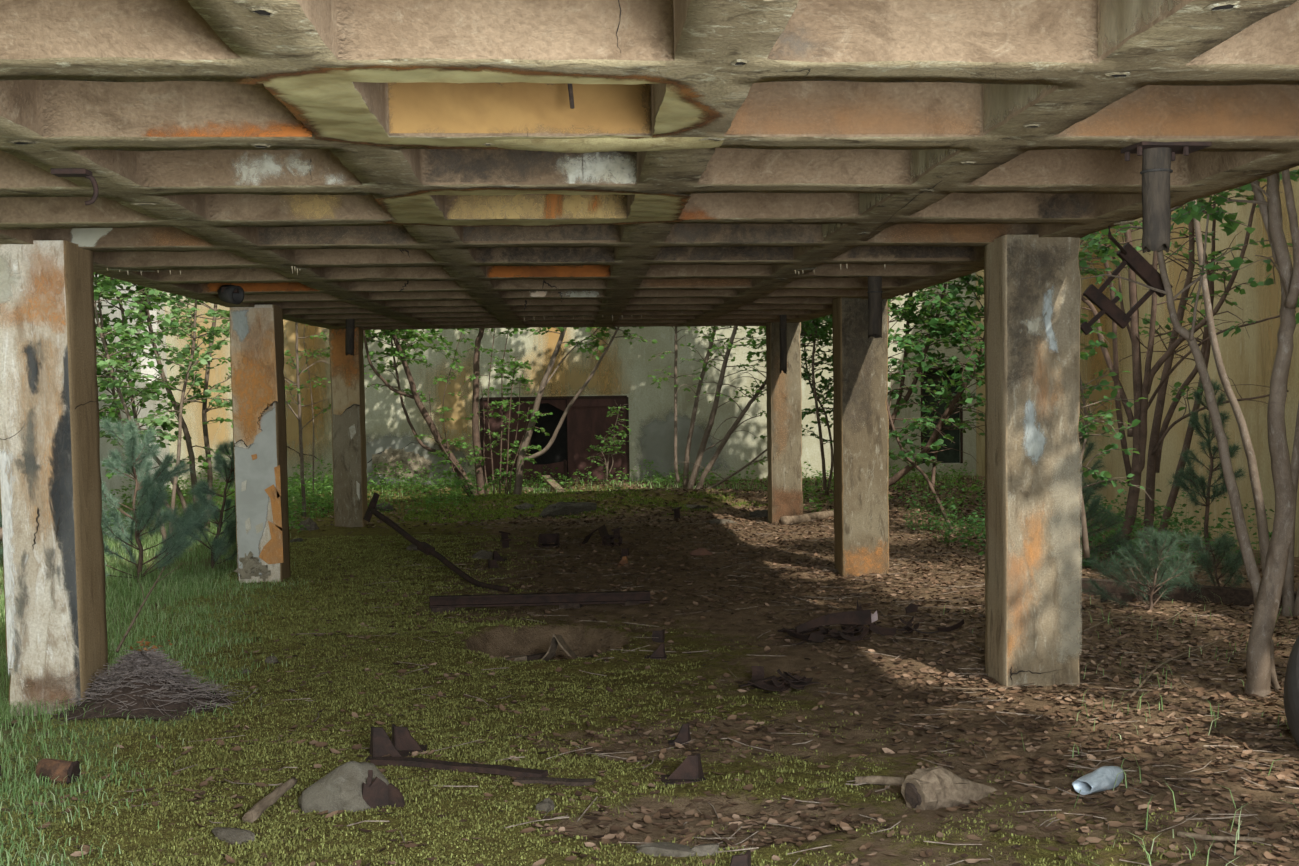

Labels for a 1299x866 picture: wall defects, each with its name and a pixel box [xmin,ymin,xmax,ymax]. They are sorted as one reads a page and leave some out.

corrosion [146,123,312,137]
leakage [237,65,816,263]
corrosion [488,265,611,277]
leakage [0,346,81,708]
spalling [230,308,284,581]
peeling [330,342,360,439]